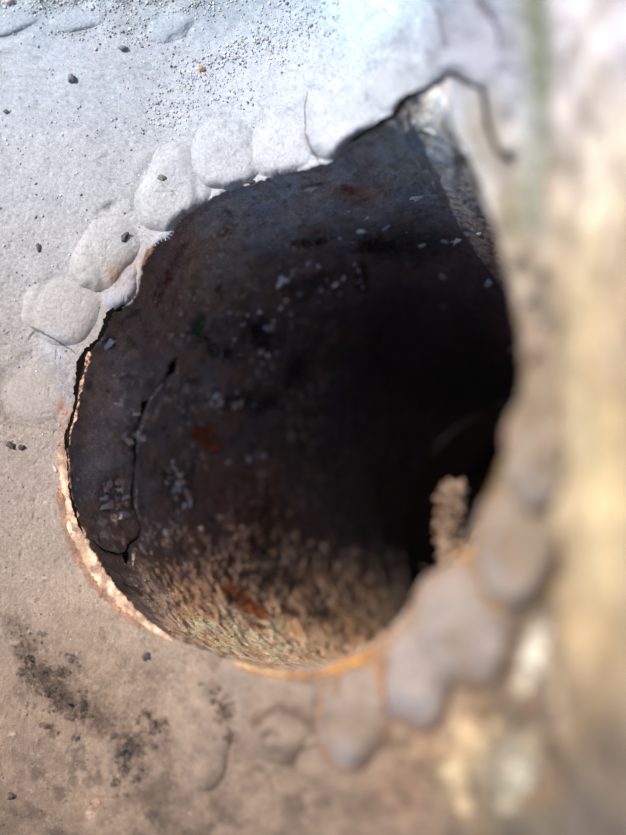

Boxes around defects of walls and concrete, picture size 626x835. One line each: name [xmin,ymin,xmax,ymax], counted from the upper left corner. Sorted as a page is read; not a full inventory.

crack [432,4,449,51]
crack [476,0,501,49]
peeling [407,92,450,136]
crack [348,72,515,163]
peeling [230,260,346,372]
peeling [164,460,193,520]
spalling [53,446,173,642]
corrosion [222,583,270,628]
corrosion [279,604,300,617]
corrosion [234,631,399,713]